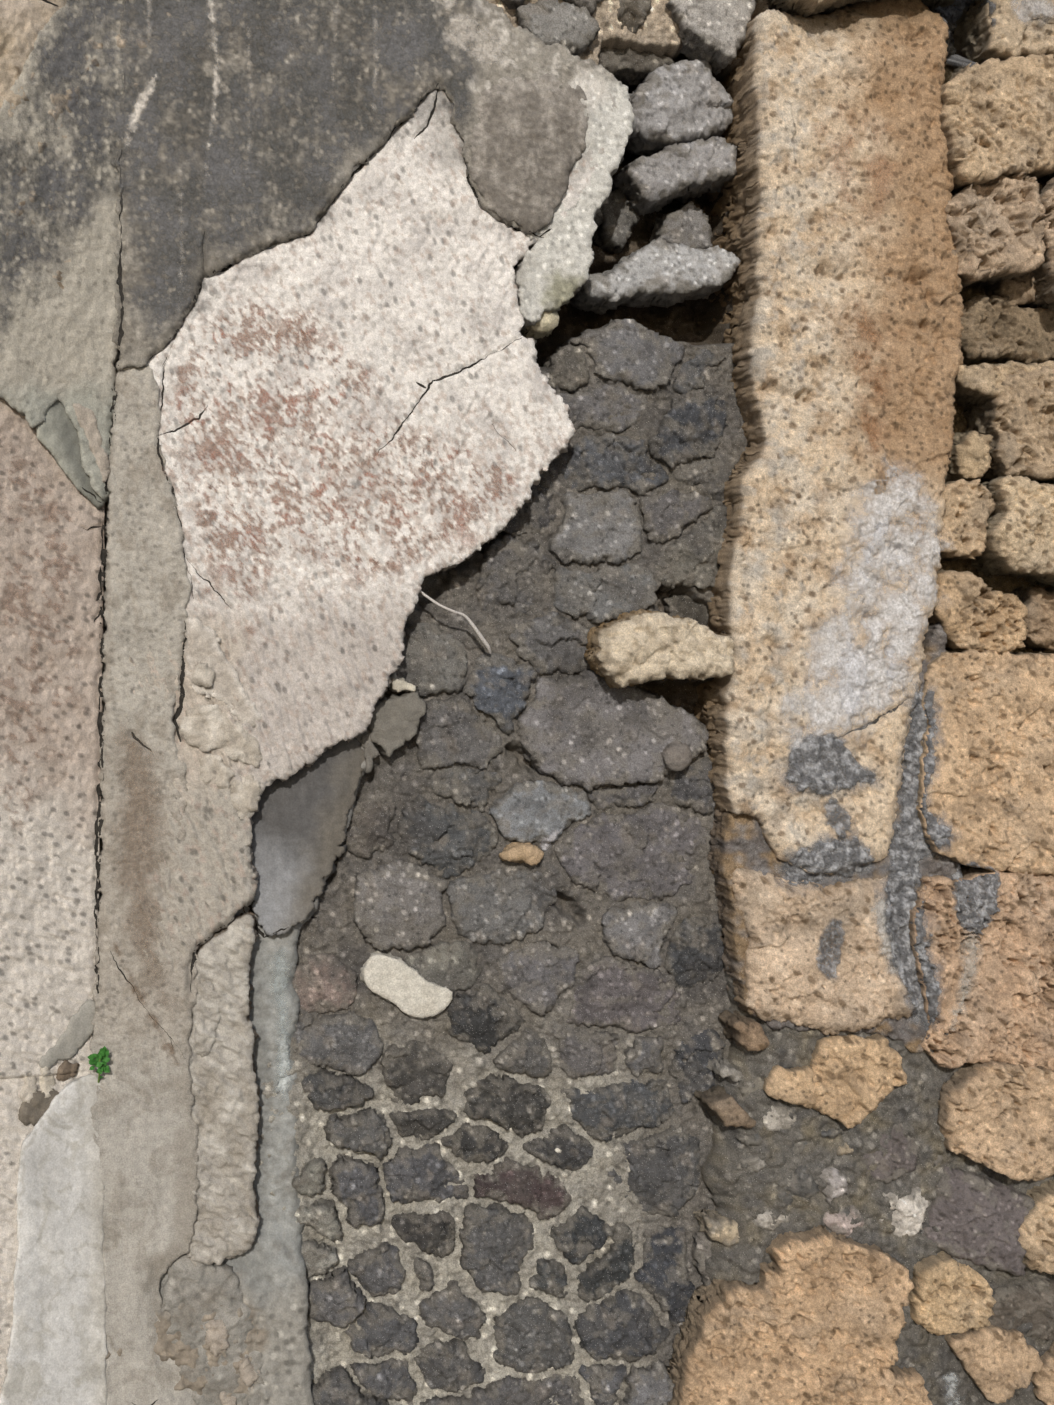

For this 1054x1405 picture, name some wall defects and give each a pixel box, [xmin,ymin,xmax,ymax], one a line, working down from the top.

crack [80,83,440,1059]
crack [375,338,521,456]
flaking render [161,616,428,1405]